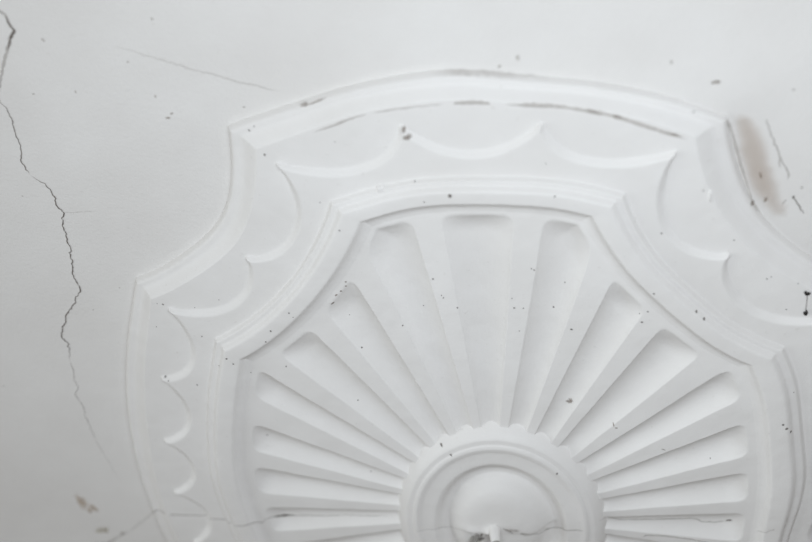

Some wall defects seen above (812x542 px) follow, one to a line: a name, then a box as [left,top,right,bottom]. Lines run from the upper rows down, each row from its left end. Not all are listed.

crack [6,108,98,444]